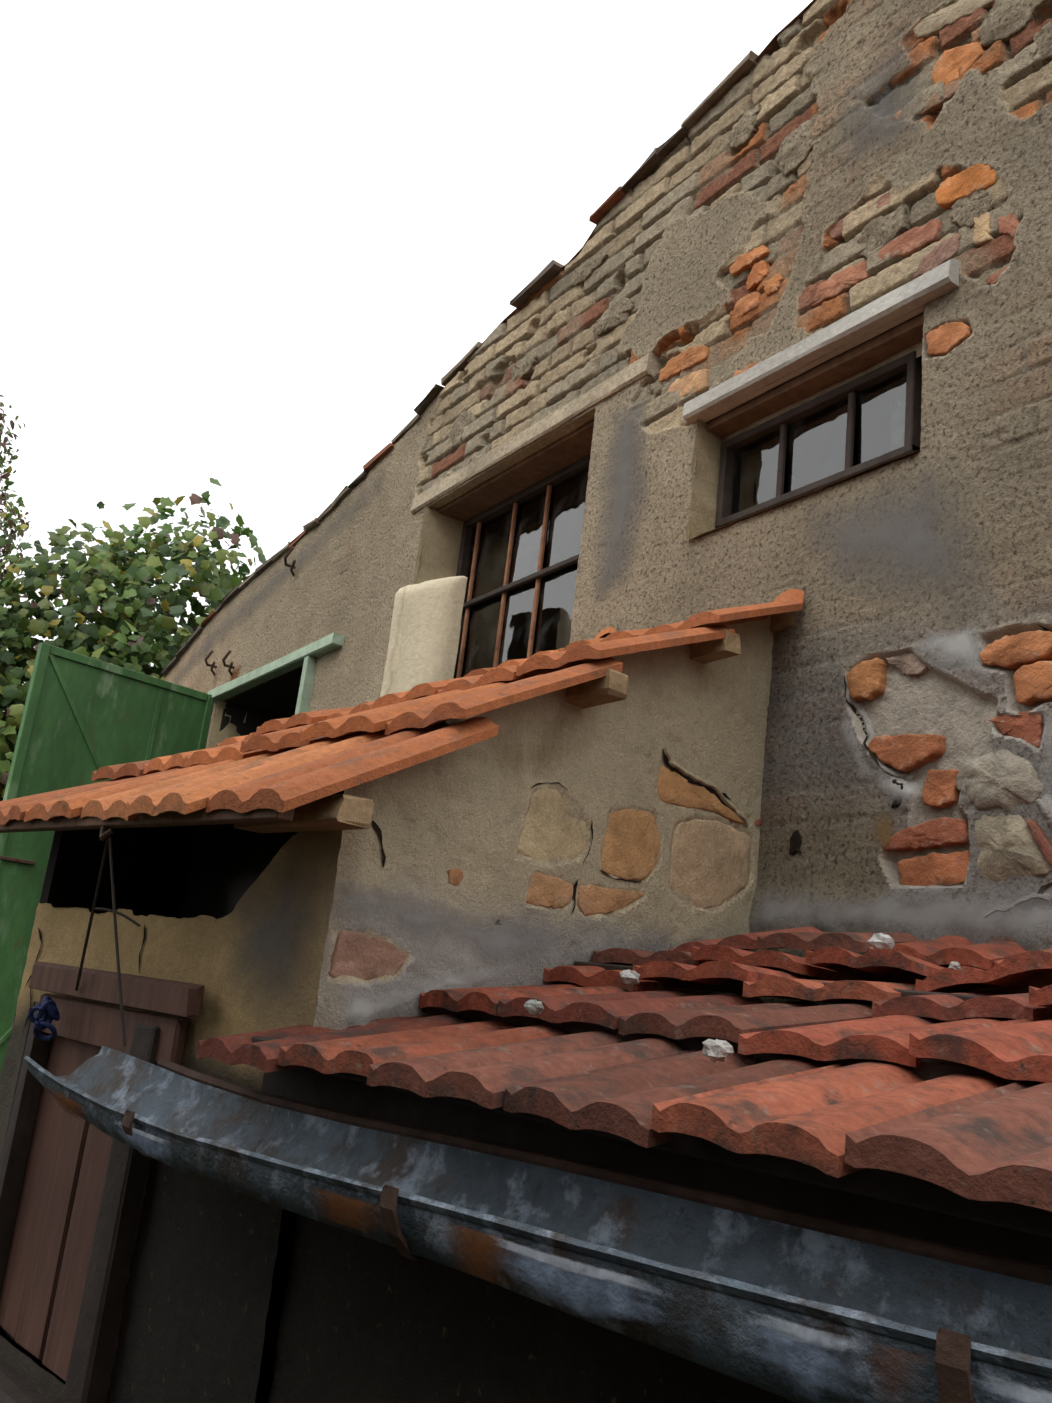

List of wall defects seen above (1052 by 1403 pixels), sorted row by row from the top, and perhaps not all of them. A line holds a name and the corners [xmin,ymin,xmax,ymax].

flaking render [977,0,1052,67]
flaking render [729,104,761,153]
flaking render [773,114,818,177]
flaking render [857,204,911,258]
flaking render [949,189,994,229]
spalling [922,316,974,361]
spalling [844,621,1052,889]
crack [663,748,749,827]
flaking render [524,756,762,921]